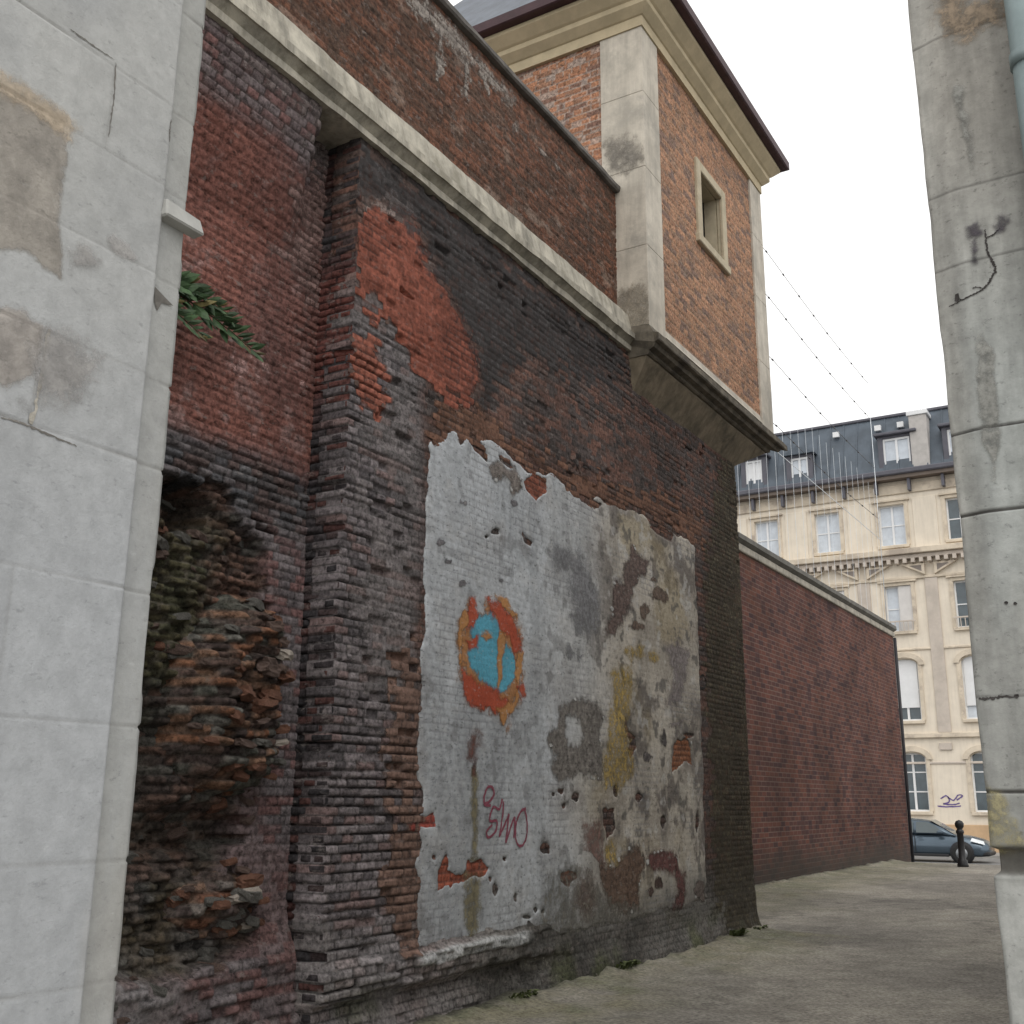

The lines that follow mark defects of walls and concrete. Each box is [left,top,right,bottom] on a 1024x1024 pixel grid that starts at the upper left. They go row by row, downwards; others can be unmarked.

crack [71,29,116,136]
water stain [603,138,644,174]
crack [949,229,999,307]
spalling [346,195,706,552]
peeling [666,643,690,707]
spalling [114,471,277,1006]
spalling [662,719,692,772]
spalling [438,855,488,890]
spalling [114,1003,131,1024]